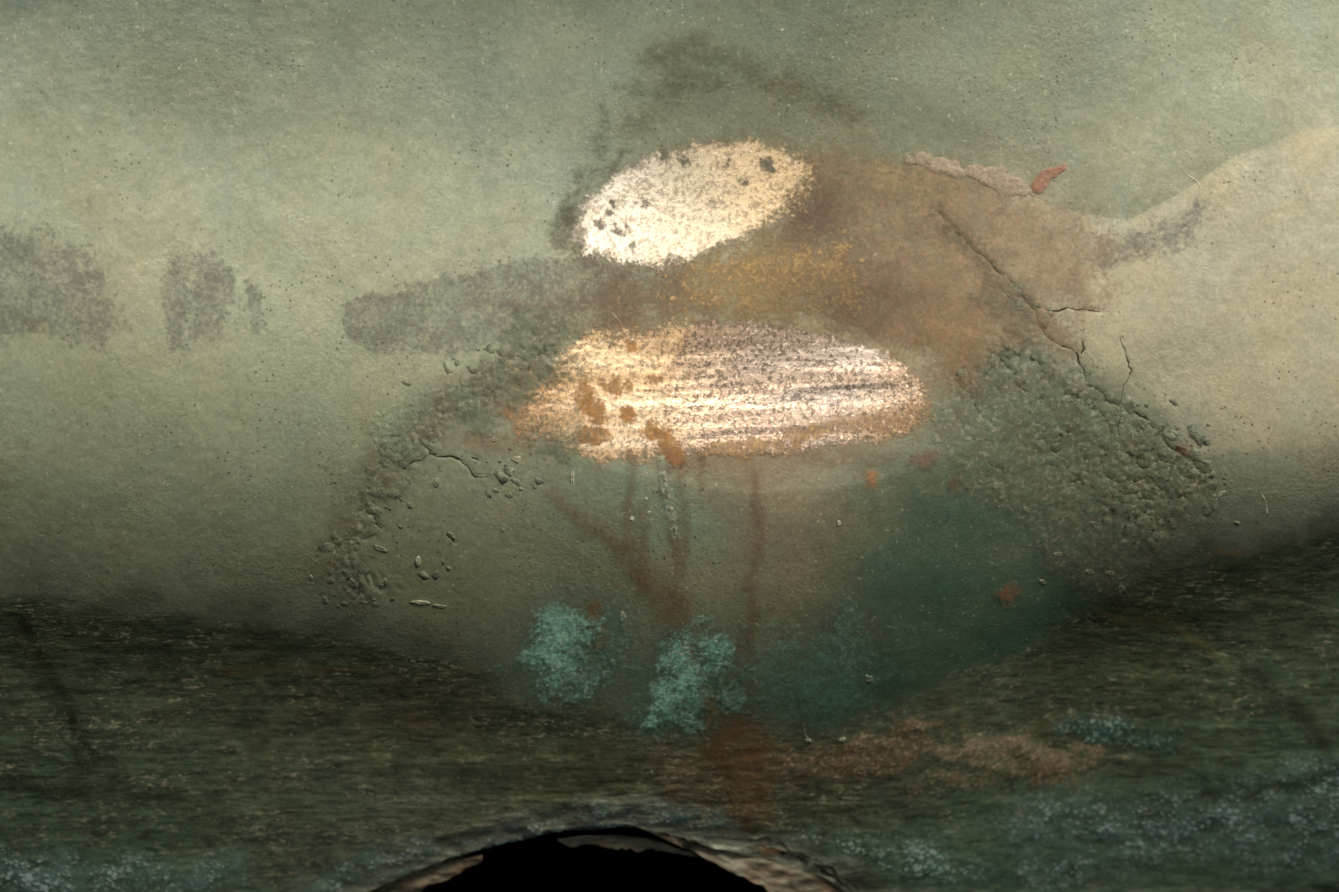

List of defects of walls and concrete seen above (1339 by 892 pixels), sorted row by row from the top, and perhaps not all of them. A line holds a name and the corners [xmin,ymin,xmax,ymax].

spalling [760,156,775,172]
spalling [594,199,635,253]
crack [938,206,1200,527]